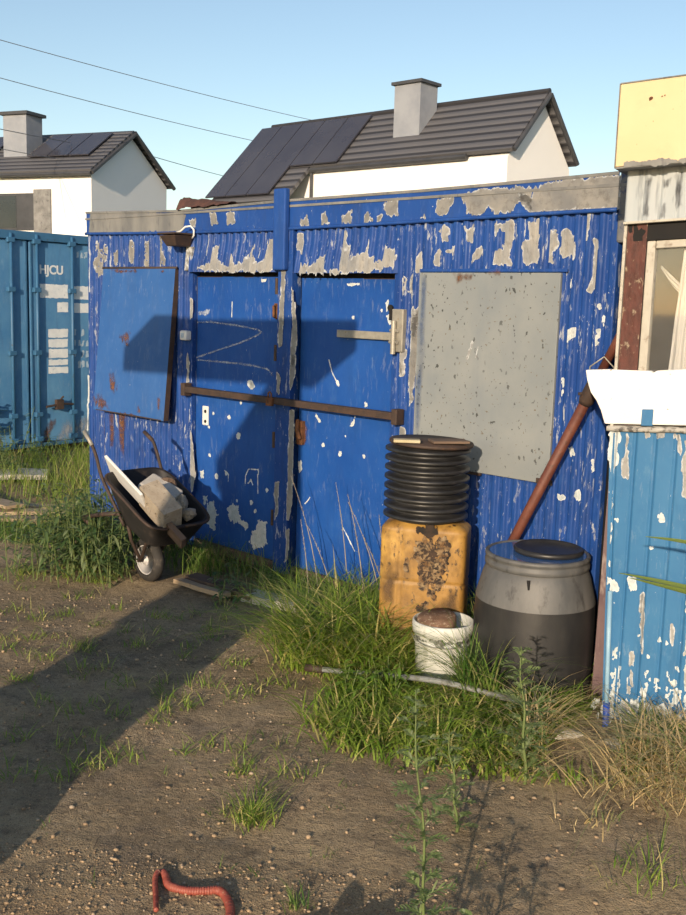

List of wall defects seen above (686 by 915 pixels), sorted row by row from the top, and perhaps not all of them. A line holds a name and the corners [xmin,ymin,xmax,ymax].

peeling [197,239,297,395]
peeling [296,209,397,286]
peeling [364,197,399,223]
peeling [399,158,686,406]
peeling [190,431,204,492]
peeling [203,409,302,563]
peeling [608,431,629,480]
peeling [645,432,686,498]
peeling [590,560,686,728]